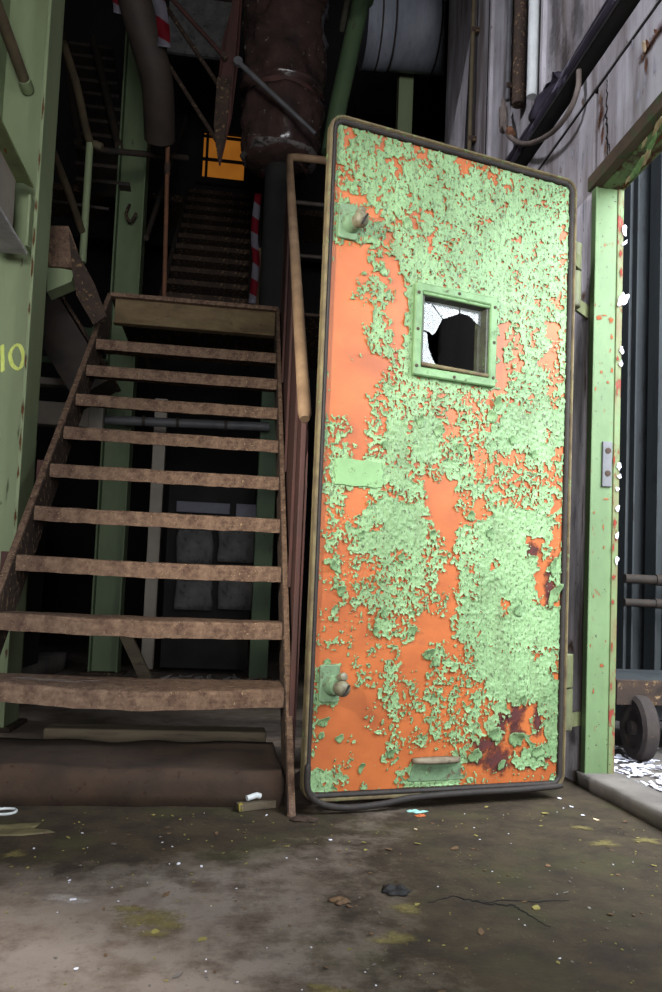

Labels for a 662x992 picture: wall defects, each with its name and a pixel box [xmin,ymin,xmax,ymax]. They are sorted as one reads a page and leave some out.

peeling [310,125,570,793]
corrosion [544,556,555,608]
corrosion [470,706,550,776]